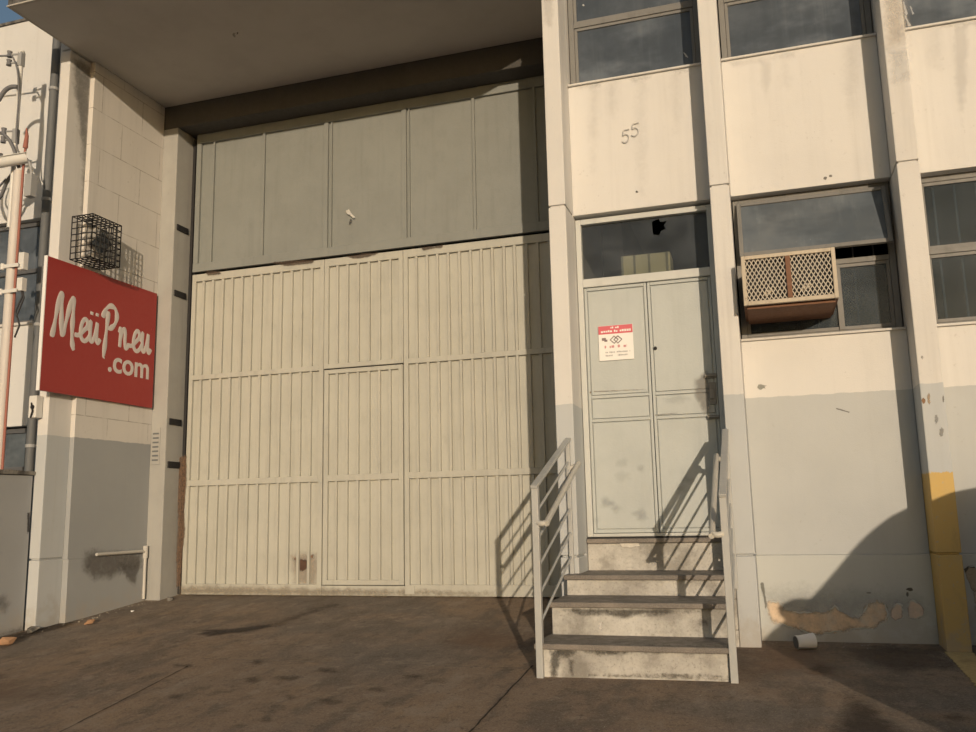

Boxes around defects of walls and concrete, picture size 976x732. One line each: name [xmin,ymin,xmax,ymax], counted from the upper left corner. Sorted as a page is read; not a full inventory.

damp [86,554,140,581]
peeling [761,583,925,634]